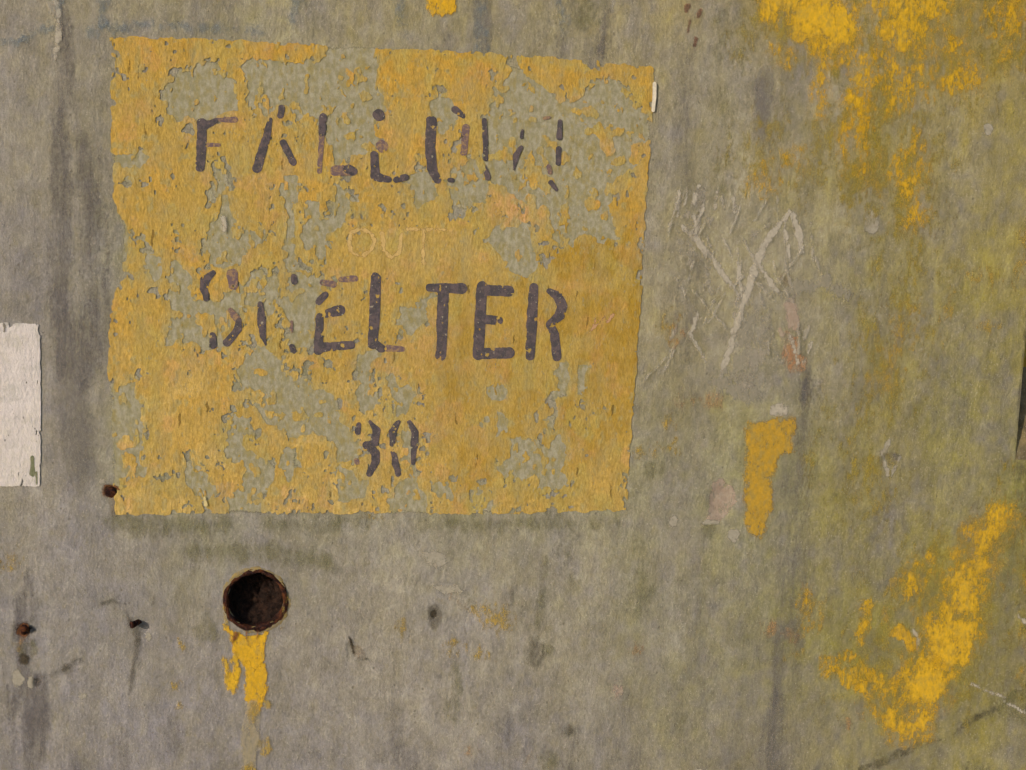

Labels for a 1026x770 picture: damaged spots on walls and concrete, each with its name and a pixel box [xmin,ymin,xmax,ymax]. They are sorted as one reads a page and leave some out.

peeling [162,47,391,165]
peeling [760,0,988,132]
peeling [984,0,1022,62]
peeling [114,149,149,185]
peeling [402,55,654,278]
peeling [110,375,147,488]
peeling [143,167,369,513]
peeling [351,349,454,513]
peeling [392,292,437,336]
peeling [477,383,574,496]
peeling [551,361,592,401]
peeling [819,501,1021,744]